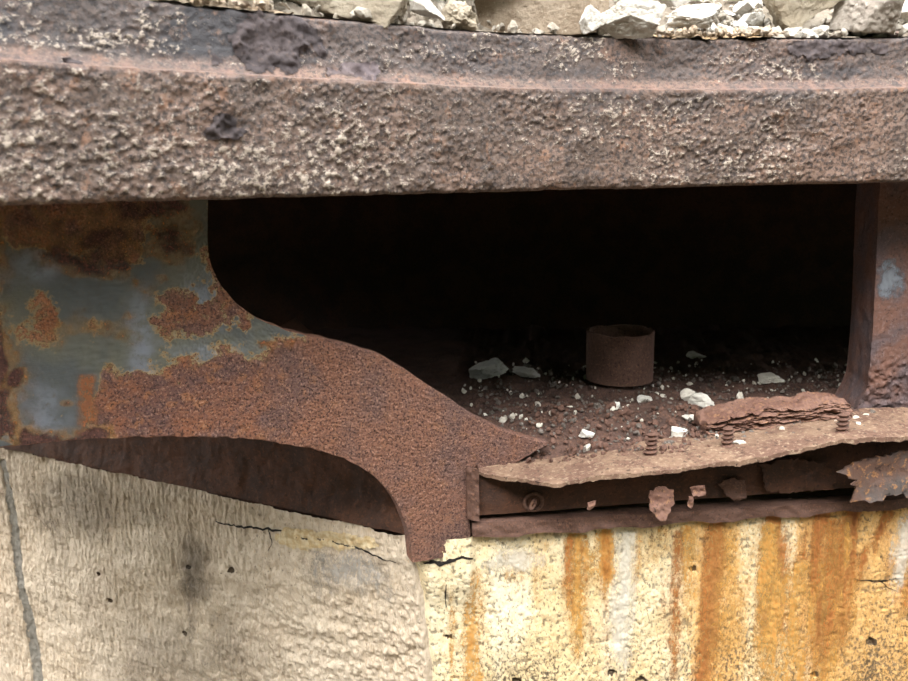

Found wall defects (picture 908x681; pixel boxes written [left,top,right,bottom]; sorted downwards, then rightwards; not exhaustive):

rust [326,61,380,81]
rust [32,200,201,280]
rust [0,320,112,445]
crack [216,521,396,563]
rust [449,570,485,681]
rust [563,529,616,658]
rust [648,485,741,681]
rust [718,477,747,501]
rust [749,450,908,681]